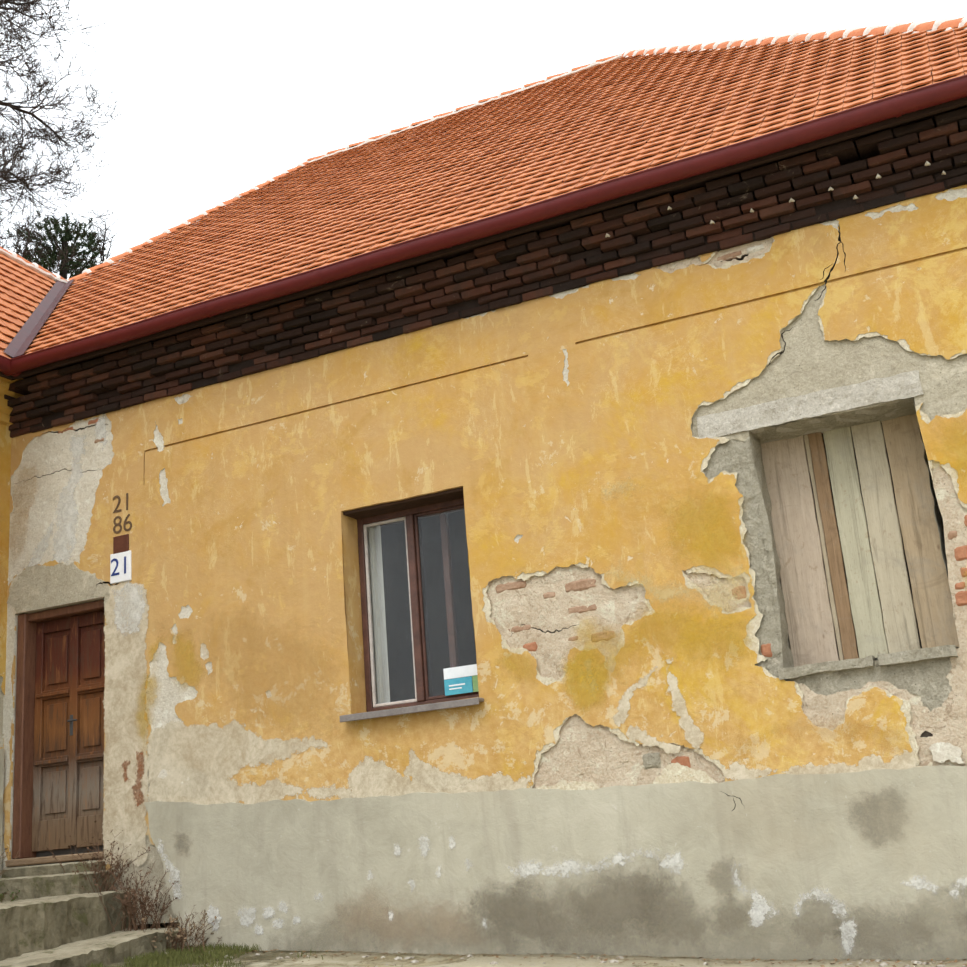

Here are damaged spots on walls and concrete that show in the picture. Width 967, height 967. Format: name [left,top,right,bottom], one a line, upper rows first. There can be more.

flaking render [550,285,589,299]
flaking render [612,273,639,281]
flaking render [656,237,775,273]
crack [815,226,846,301]
flaking render [691,247,967,439]
flaking render [8,414,114,586]
peeling [0,604,16,794]
peeling [101,431,967,925]
water stain [508,848,684,878]
water stain [238,901,300,935]
water stain [734,869,777,927]
water stain [794,889,857,954]